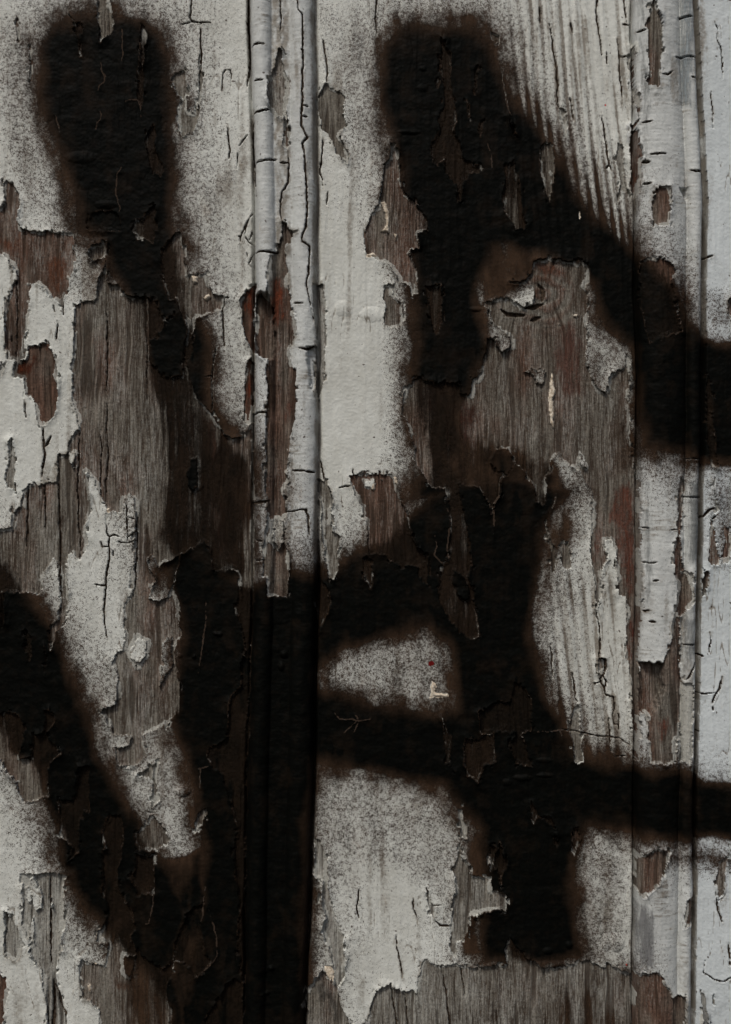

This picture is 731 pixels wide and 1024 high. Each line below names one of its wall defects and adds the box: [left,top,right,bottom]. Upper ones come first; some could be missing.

crack [182,0,329,319]
peeling [364,138,427,327]
peeling [539,143,555,202]
peeling [613,0,675,227]
crack [23,316,138,638]
peeling [0,180,302,895]
peeling [345,470,410,558]
peeling [447,255,731,769]
crack [537,607,625,757]
peeling [0,869,71,1024]
peeling [75,925,179,1024]
peeling [301,804,715,1024]